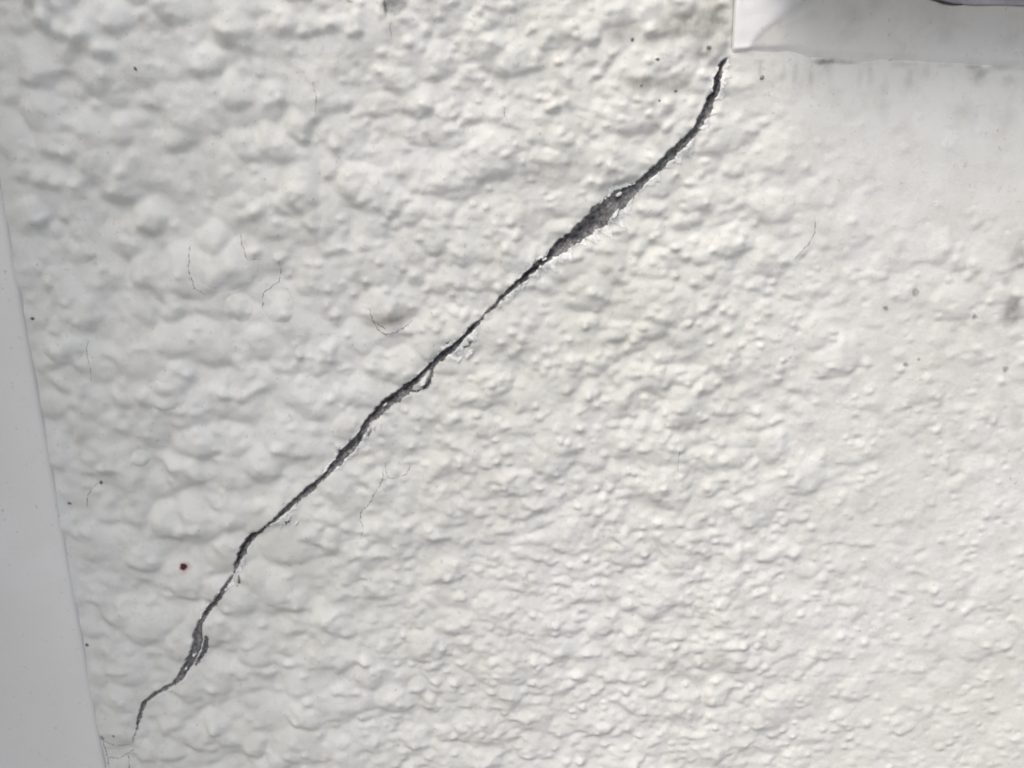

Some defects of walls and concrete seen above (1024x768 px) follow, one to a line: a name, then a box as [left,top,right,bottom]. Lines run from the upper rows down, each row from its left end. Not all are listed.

crack [102,57,734,768]